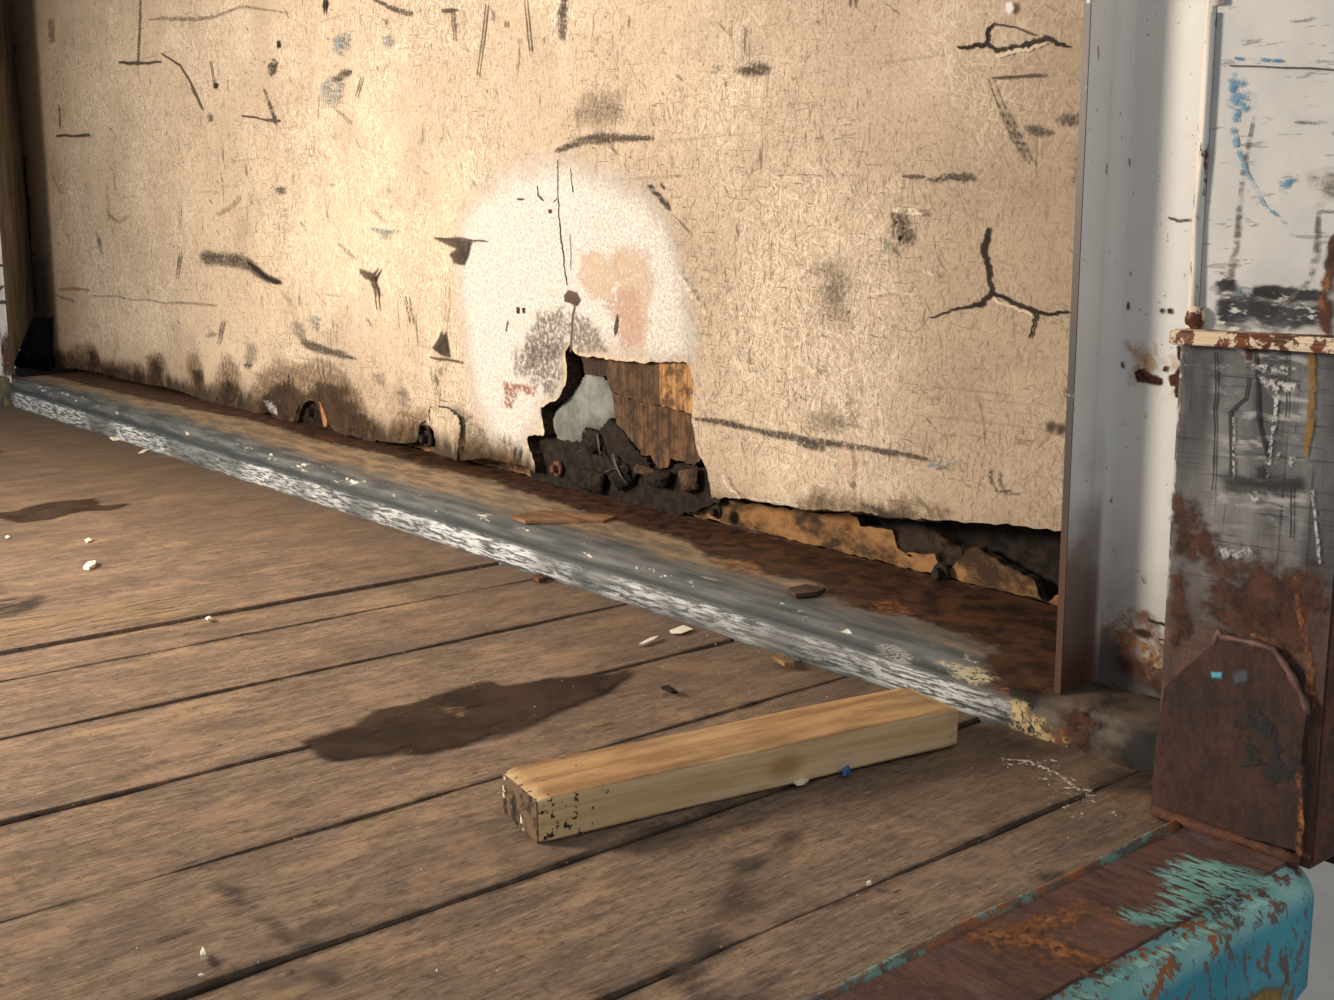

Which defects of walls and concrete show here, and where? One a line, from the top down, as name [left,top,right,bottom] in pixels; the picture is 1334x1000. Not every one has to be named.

crack [957,22,1070,58]
crack [929,227,1070,339]
water stain [56,345,166,386]
water stain [187,353,373,436]
rust [1121,343,1181,398]
water stain [459,437,517,463]
rust [48,371,1058,694]
rust [1098,494,1331,710]
water stain [303,669,631,760]
rust [1296,767,1304,856]
rust [969,898,1132,974]
rust [1248,961,1303,1000]